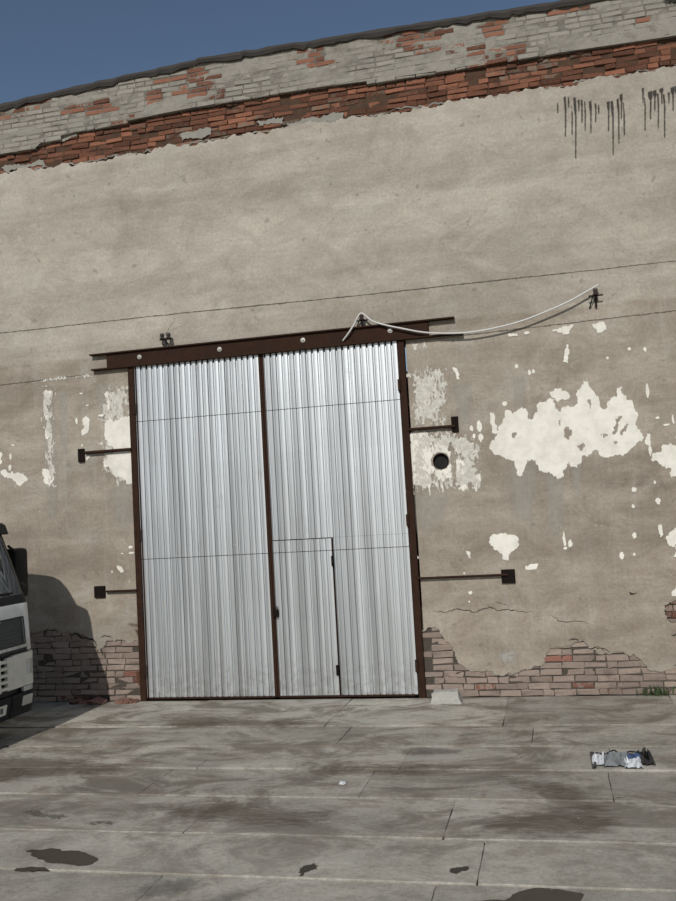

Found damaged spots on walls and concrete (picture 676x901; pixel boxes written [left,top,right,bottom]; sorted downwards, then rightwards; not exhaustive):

spalling [0,38,676,174]
leakage [557,94,625,158]
leakage [642,86,676,137]
peeling [0,444,28,486]
peeling [34,373,96,488]
peeling [75,385,132,489]
peeling [406,365,676,496]
peeling [489,533,519,560]
peeling [658,524,676,557]
spalling [664,588,676,623]
spalling [30,628,150,702]
spalling [421,607,676,698]